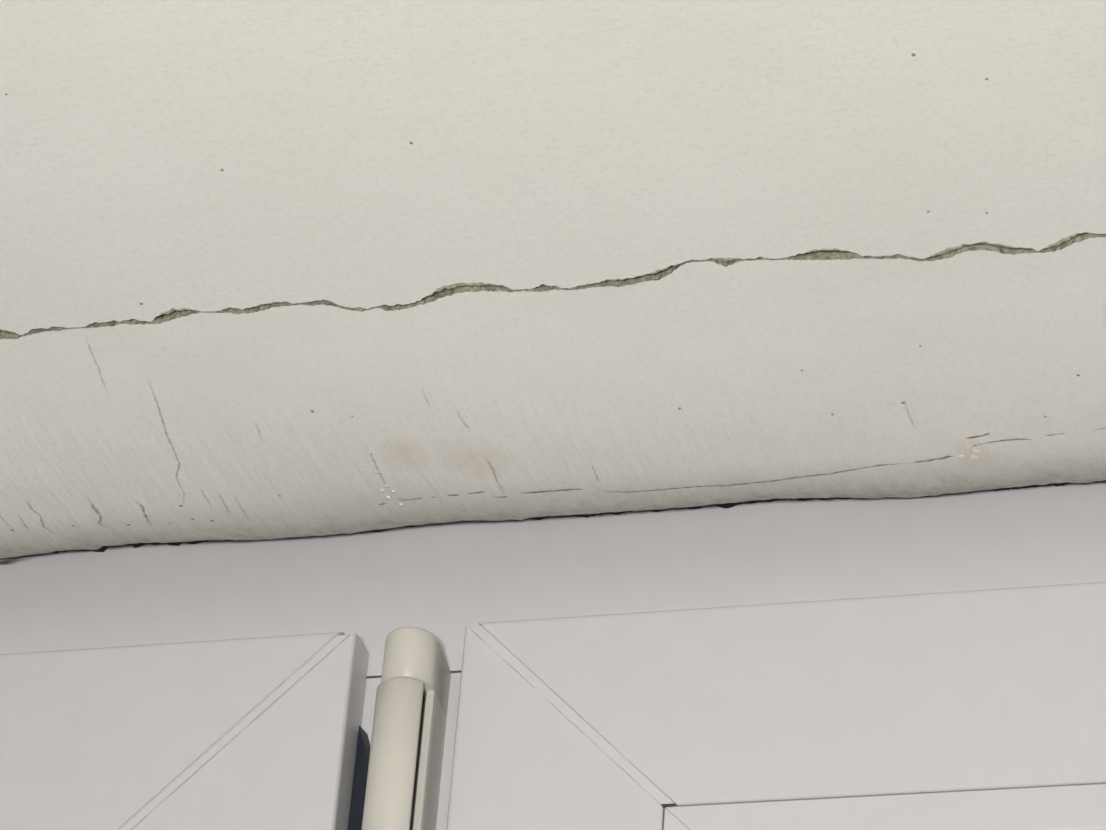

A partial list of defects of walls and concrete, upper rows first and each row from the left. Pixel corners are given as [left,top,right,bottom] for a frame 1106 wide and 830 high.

crack [0,232,1106,339]
crack [334,433,1063,535]
crack [992,480,1106,491]
crack [18,540,234,558]